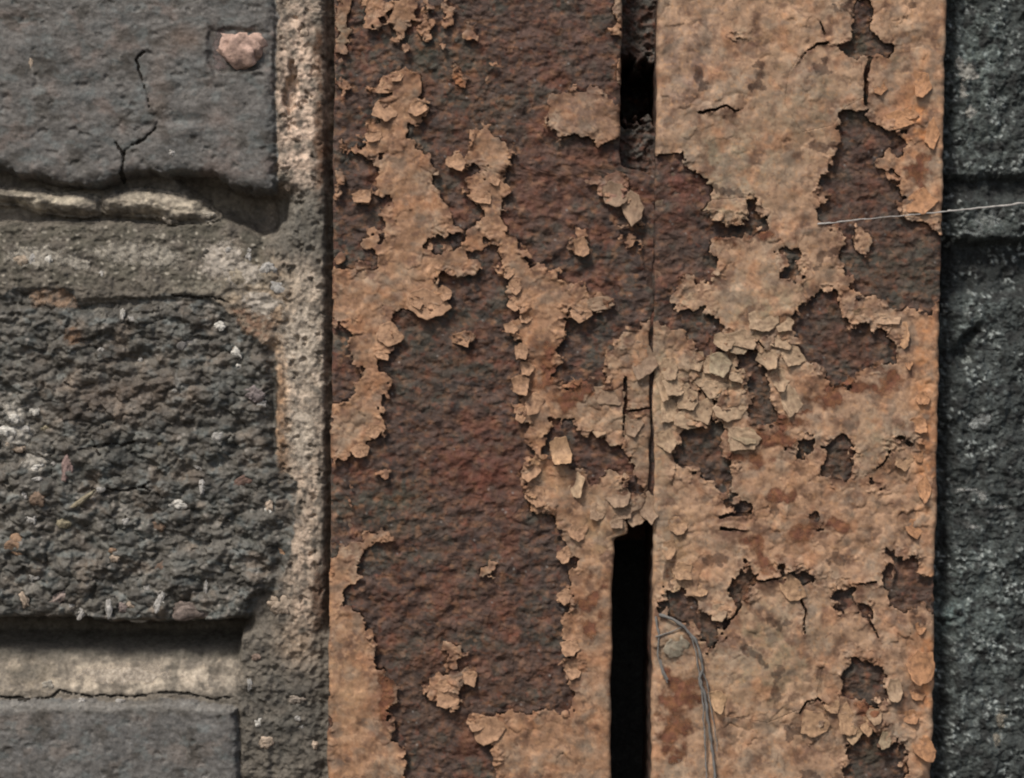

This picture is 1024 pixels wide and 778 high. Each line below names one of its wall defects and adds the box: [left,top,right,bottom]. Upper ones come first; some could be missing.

crack [863,56,873,106]
crack [115,51,157,184]
crack [698,104,739,114]
rust [313,0,941,778]
crack [0,689,230,702]